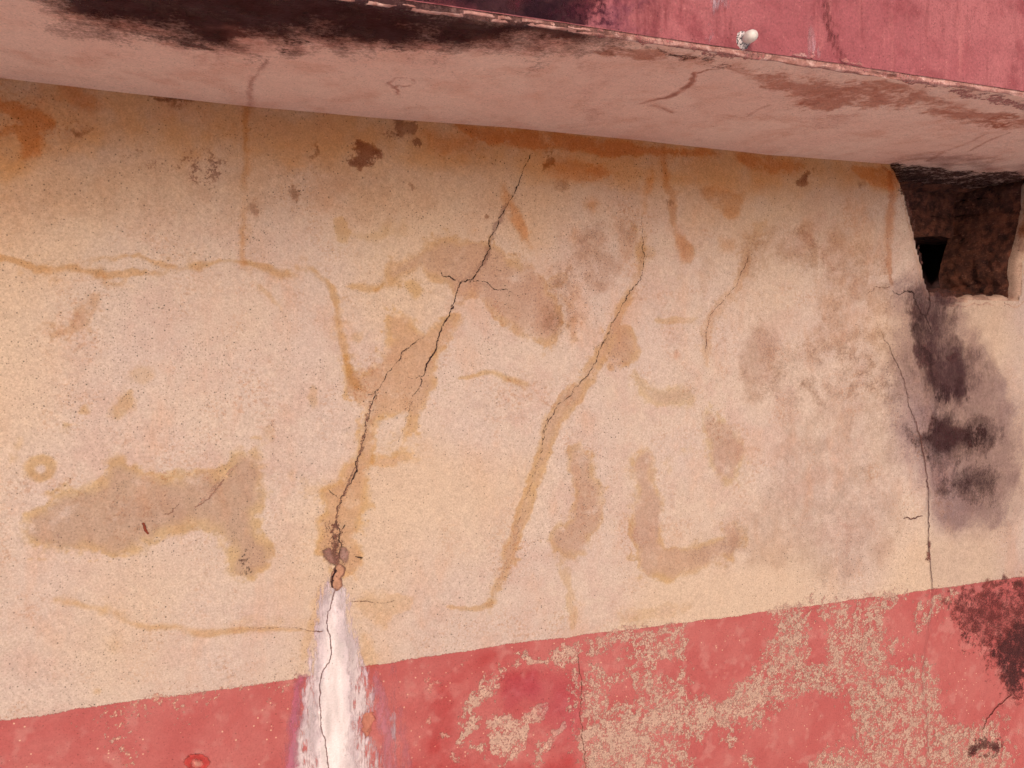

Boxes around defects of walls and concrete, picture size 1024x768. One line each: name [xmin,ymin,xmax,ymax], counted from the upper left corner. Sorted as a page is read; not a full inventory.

water stain [43,0,613,53]
crack [868,286,933,339]
spalling [915,244,947,288]
water stain [912,291,966,402]
crack [278,155,530,768]
crack [882,334,933,590]
water stain [919,417,994,457]
water stain [953,470,993,494]
water stain [286,581,395,768]
peeling [439,584,1021,768]
water stain [942,575,1024,700]